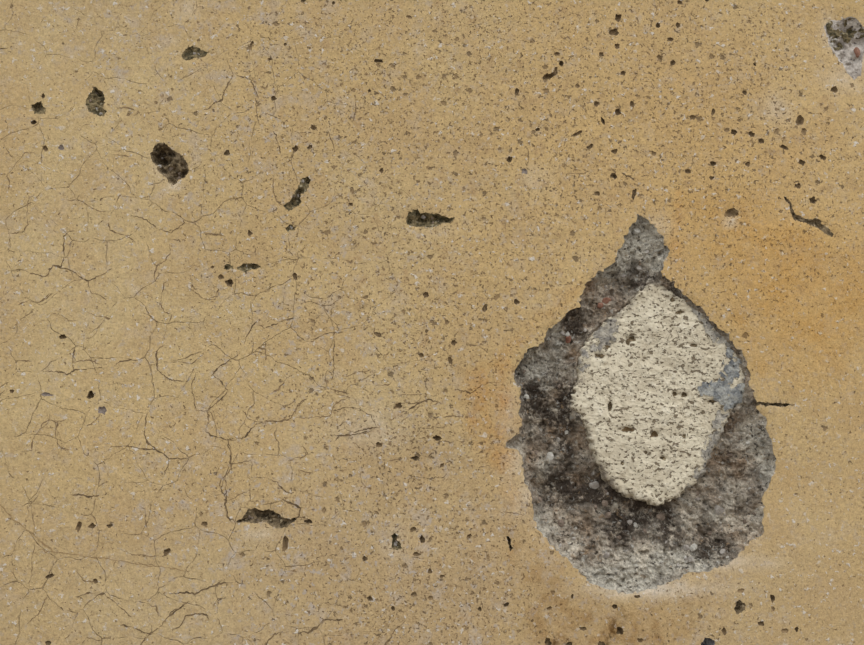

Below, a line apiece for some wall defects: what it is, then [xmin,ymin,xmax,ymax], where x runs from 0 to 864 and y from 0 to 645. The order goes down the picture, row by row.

peeling [824,17,864,80]
crack [204,61,281,153]
spalling [150,143,189,185]
crack [784,197,833,237]
crack [12,234,132,385]
crack [69,195,462,523]
crack [24,414,69,452]
spalling [506,214,776,594]
spalling [236,508,297,529]
crack [0,496,231,644]
crack [266,619,342,645]